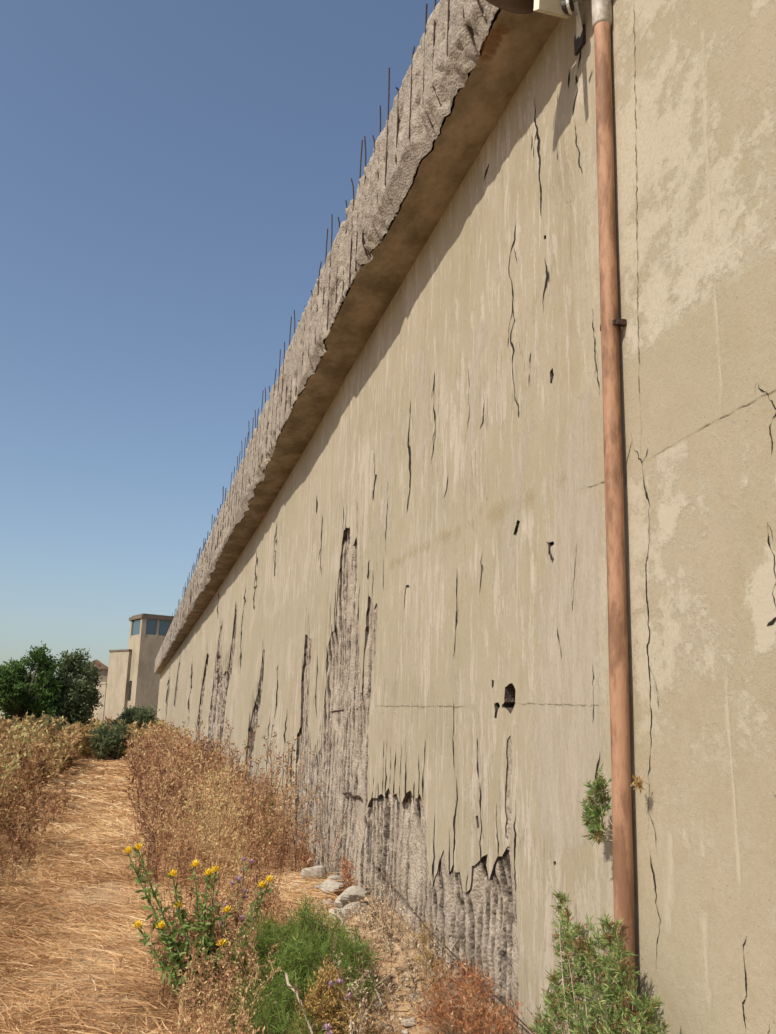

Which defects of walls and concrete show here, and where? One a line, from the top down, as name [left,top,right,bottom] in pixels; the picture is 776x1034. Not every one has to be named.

crack [531,50,582,213]
crack [508,224,531,419]
crack [542,257,550,297]
crack [575,16,776,773]
spalling [297,508,519,1025]
crack [646,798,661,960]
crack [742,936,770,1033]